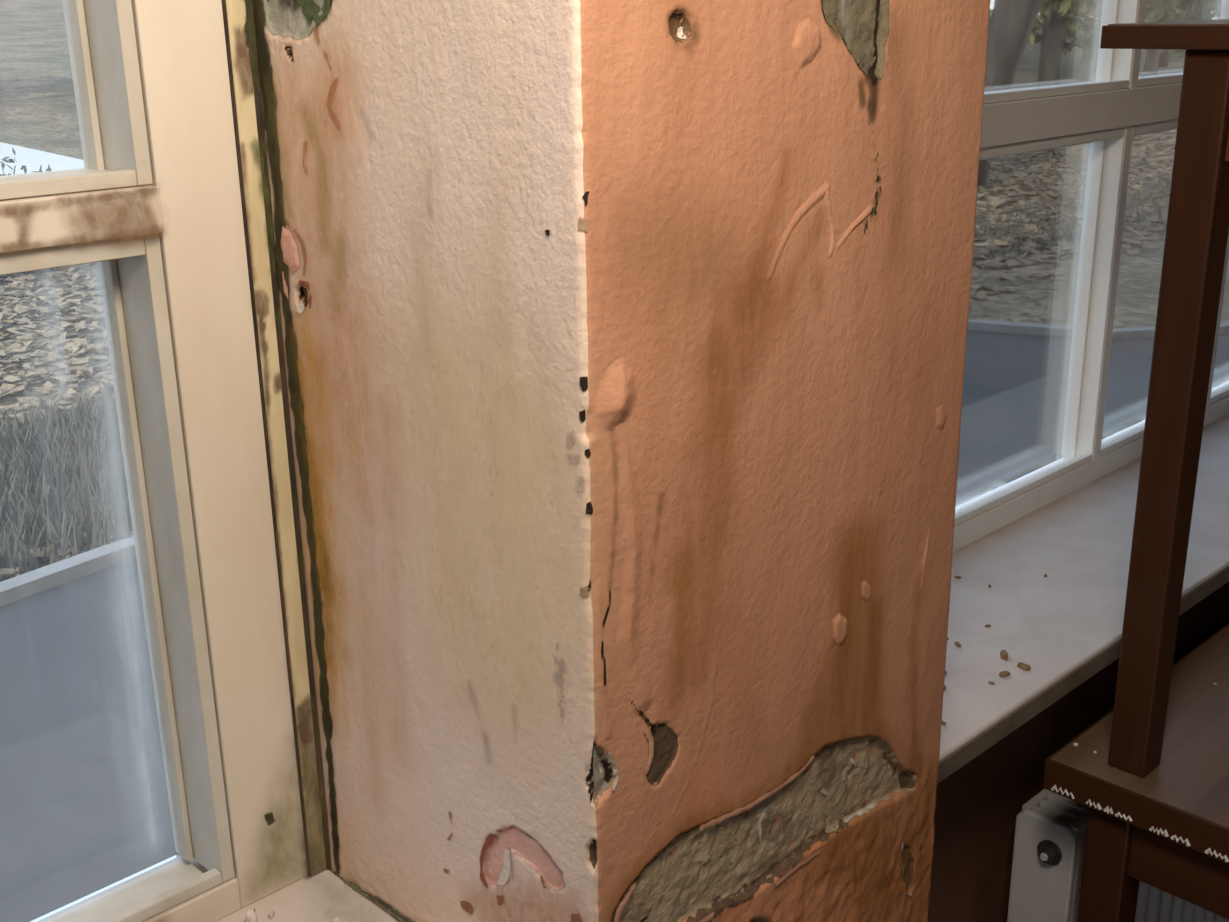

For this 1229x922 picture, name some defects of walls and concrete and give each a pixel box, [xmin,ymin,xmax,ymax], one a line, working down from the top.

peeling [263,0,332,62]
peeling [821,0,889,117]
peeling [864,144,881,232]
leakage [244,0,340,874]
spalling [586,742,619,806]
peeling [644,726,654,774]
peeling [480,826,565,890]
spalling [611,737,917,922]